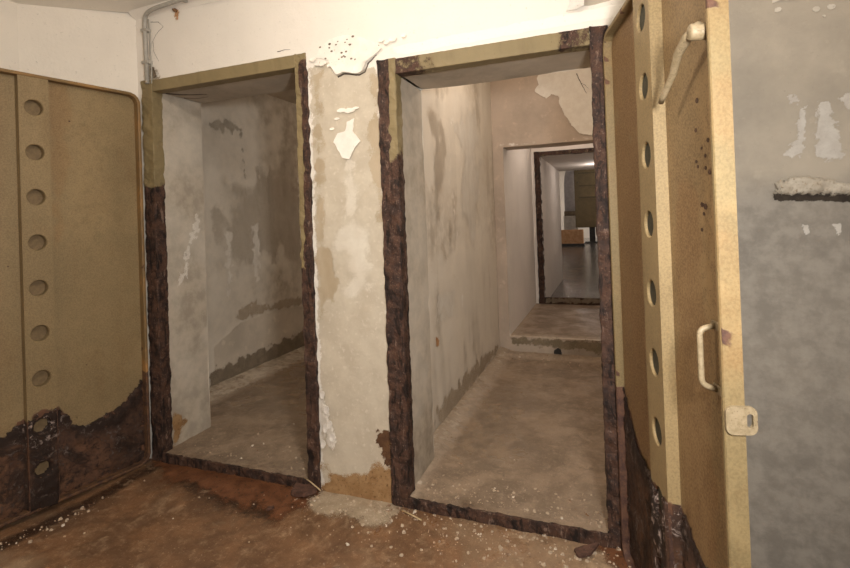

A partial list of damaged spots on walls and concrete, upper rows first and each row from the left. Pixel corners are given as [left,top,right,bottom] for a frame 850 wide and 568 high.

peeling [535,68,593,135]
leakage [210,148,302,298]
leakage [209,330,304,386]
leakage [236,297,302,320]
flaking render [308,33,406,483]
corrosion [0,380,392,549]
corrosion [597,387,706,568]